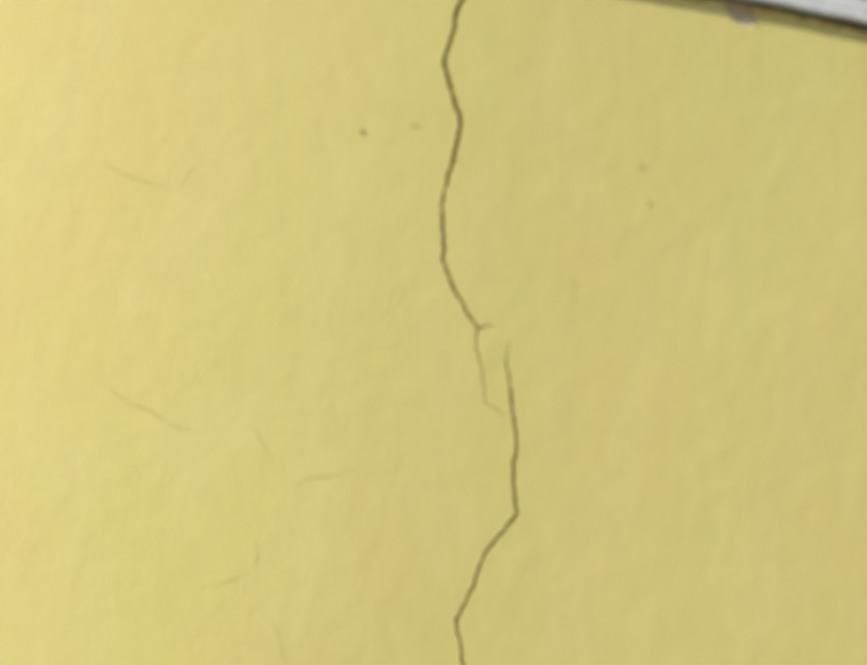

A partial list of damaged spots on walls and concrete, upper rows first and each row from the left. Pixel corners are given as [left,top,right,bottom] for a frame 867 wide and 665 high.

crack [440,0,520,665]